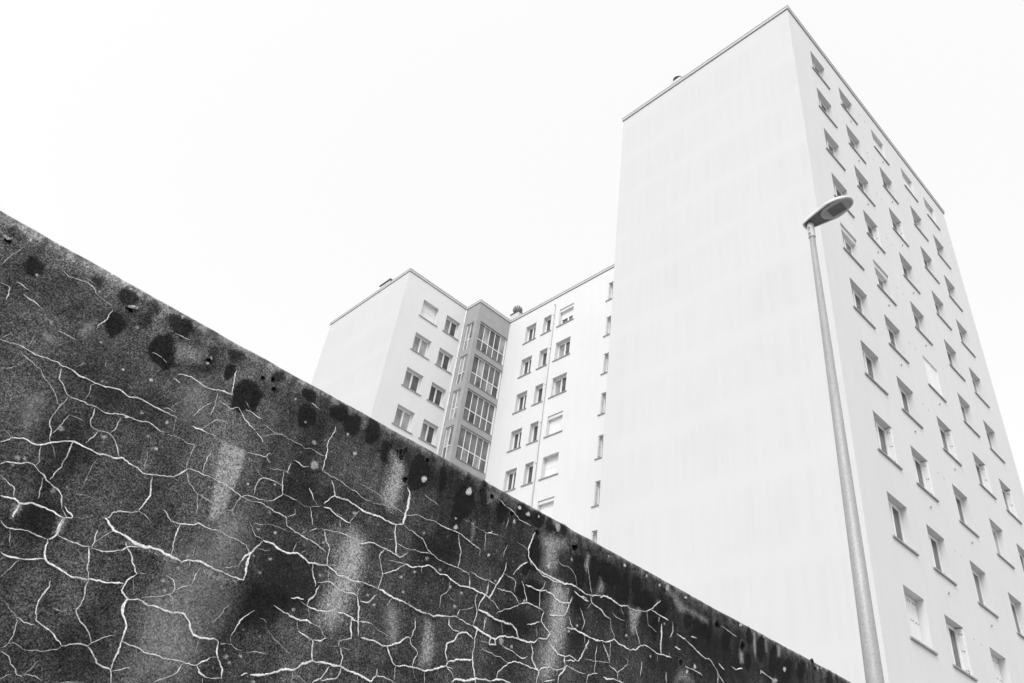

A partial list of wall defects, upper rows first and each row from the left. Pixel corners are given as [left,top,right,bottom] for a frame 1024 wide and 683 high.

water stain [106,288,138,337]
water stain [148,314,193,369]
water stain [224,350,263,413]
water stain [298,388,316,427]
water stain [209,442,245,521]
crack [1,248,772,683]
water stain [330,404,446,513]
water stain [244,528,366,630]
water stain [419,539,452,564]
water stain [452,481,667,683]
water stain [420,620,434,666]
water stain [740,627,805,680]